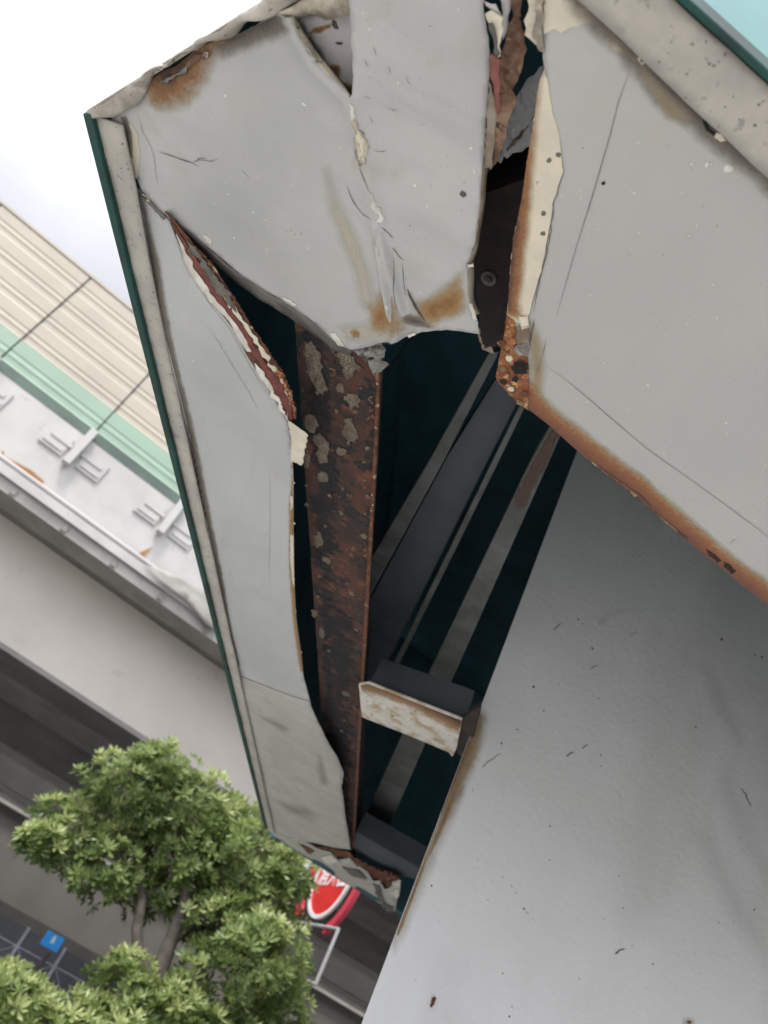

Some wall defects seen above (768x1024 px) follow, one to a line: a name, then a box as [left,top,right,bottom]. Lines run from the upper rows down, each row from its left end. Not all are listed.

corrosion [146,39,226,108]
peeling [121,117,141,178]
crack [137,115,214,181]
peeling [348,99,370,166]
peeling [507,72,564,357]
corrosion [371,296,400,334]
corrosion [418,279,464,323]
corrosion [495,69,768,605]
crack [528,56,767,544]
corrosion [289,463,303,672]
corrosion [304,331,462,829]
peeling [299,844,385,902]